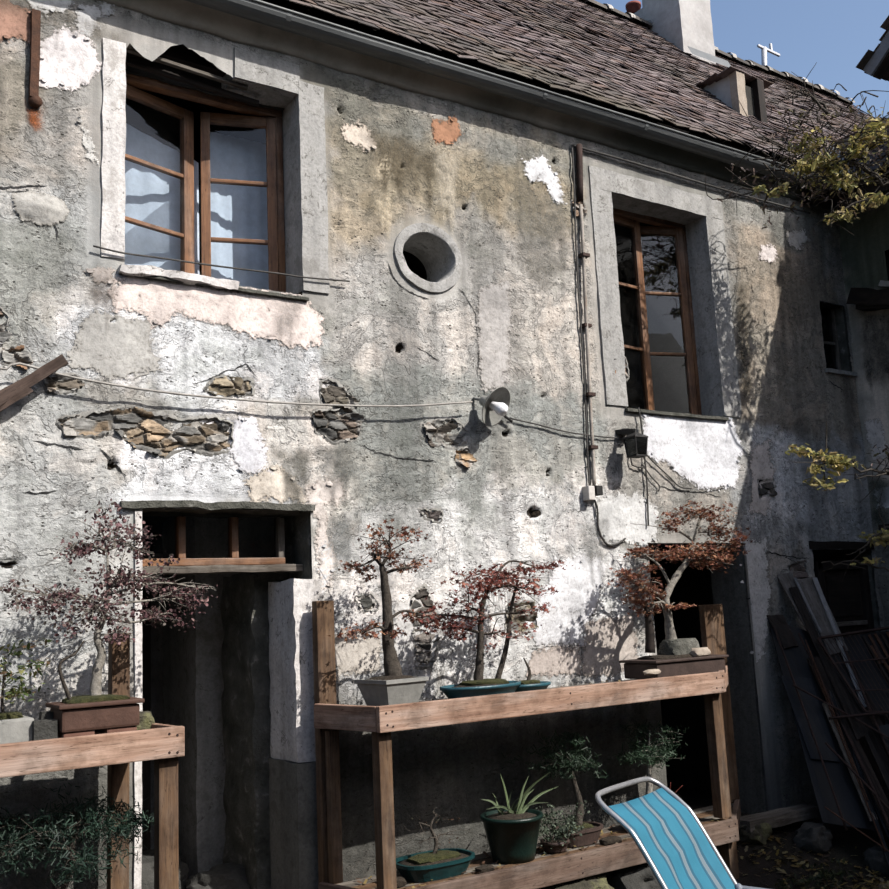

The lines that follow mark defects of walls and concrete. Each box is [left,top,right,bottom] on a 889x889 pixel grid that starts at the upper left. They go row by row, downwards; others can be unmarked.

peeling [0,0,122,92]
peeling [431,115,463,146]
peeling [521,155,587,220]
spalling [0,306,33,371]
peeling [84,267,325,350]
spalling [311,377,364,445]
spalling [420,416,477,467]
peeling [641,413,743,492]
spalling [55,406,348,596]
spalling [757,478,778,498]
spalling [409,583,440,670]